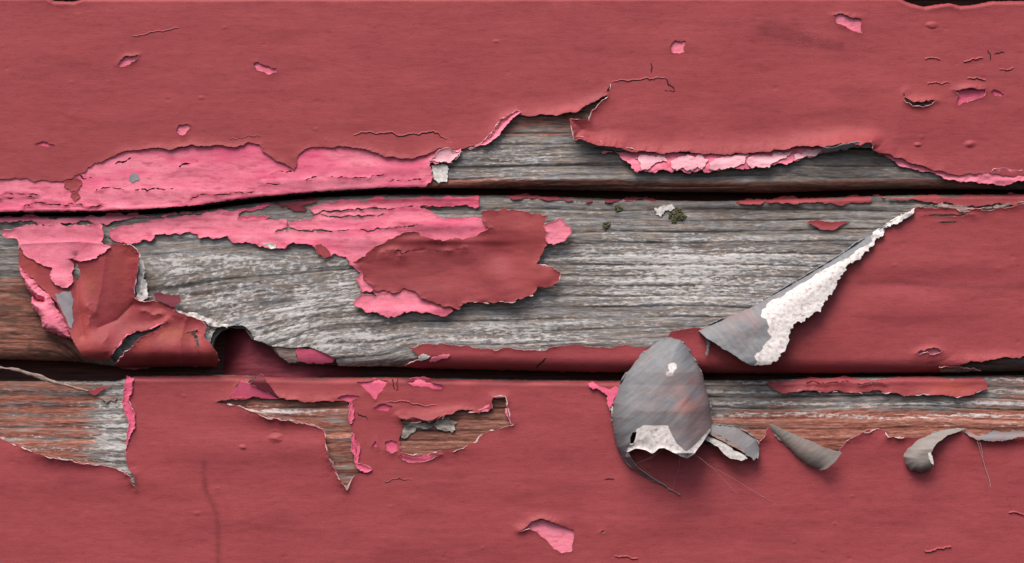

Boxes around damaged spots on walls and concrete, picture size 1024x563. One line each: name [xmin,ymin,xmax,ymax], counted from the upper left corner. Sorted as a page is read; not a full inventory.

peeling [0,84,1024,495]
peeling [521,519,574,553]